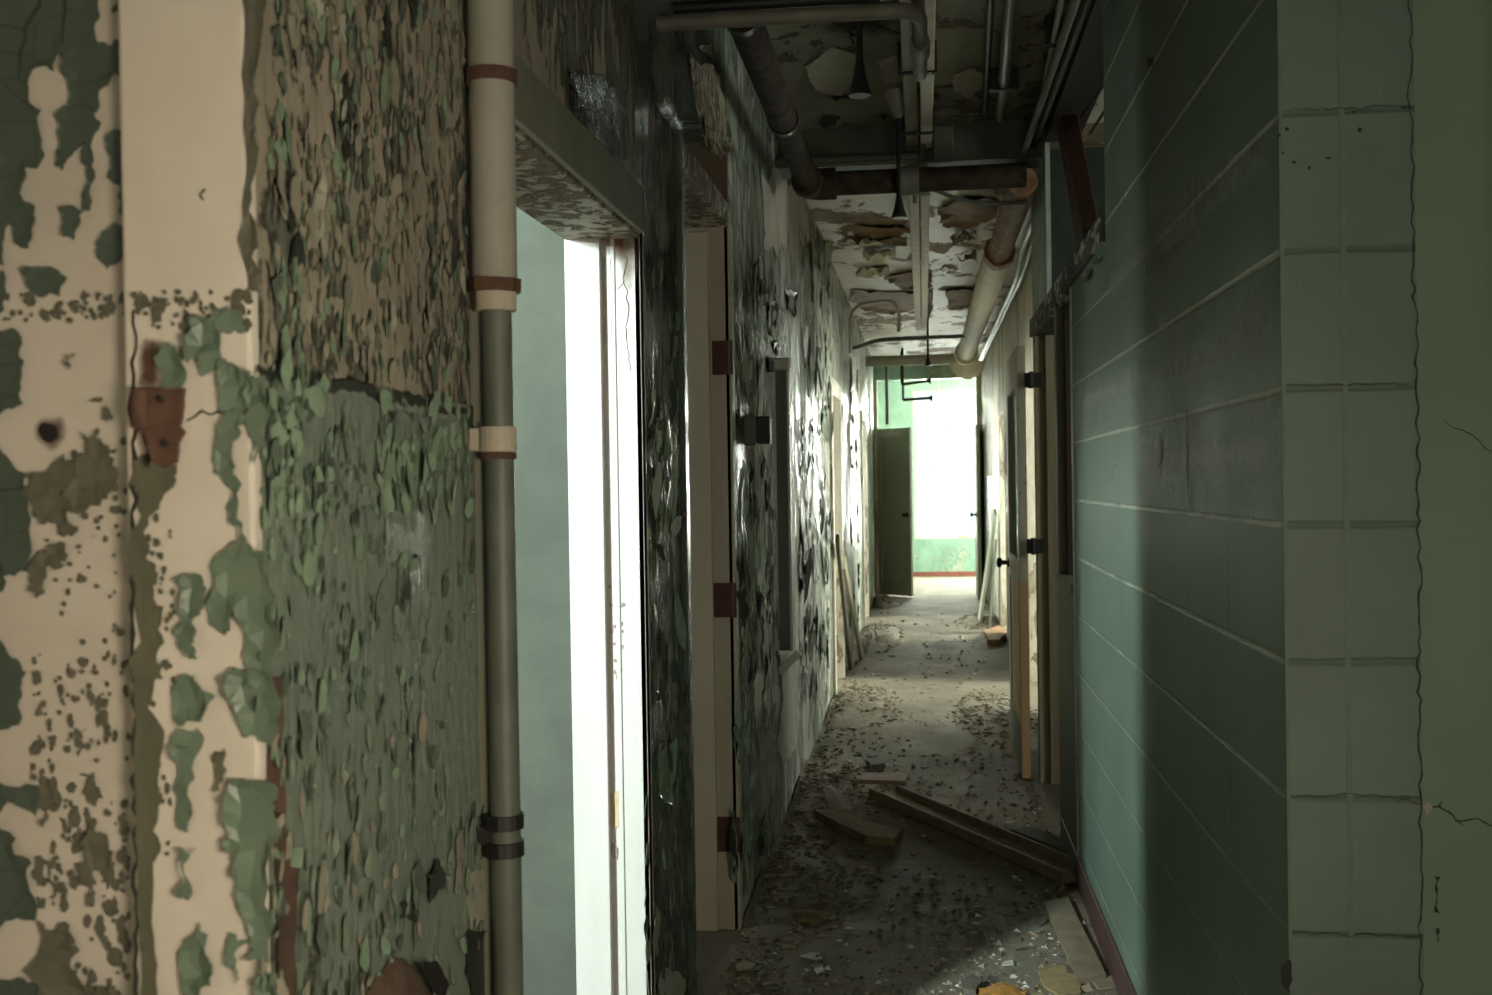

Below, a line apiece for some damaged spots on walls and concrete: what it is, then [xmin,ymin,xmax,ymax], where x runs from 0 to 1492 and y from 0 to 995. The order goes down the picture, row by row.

rust [140,342,158,385]
peeling [0,0,486,995]
peeling [730,167,974,895]
peeling [805,47,903,128]
peeling [938,198,998,263]
crack [1285,0,1492,995]